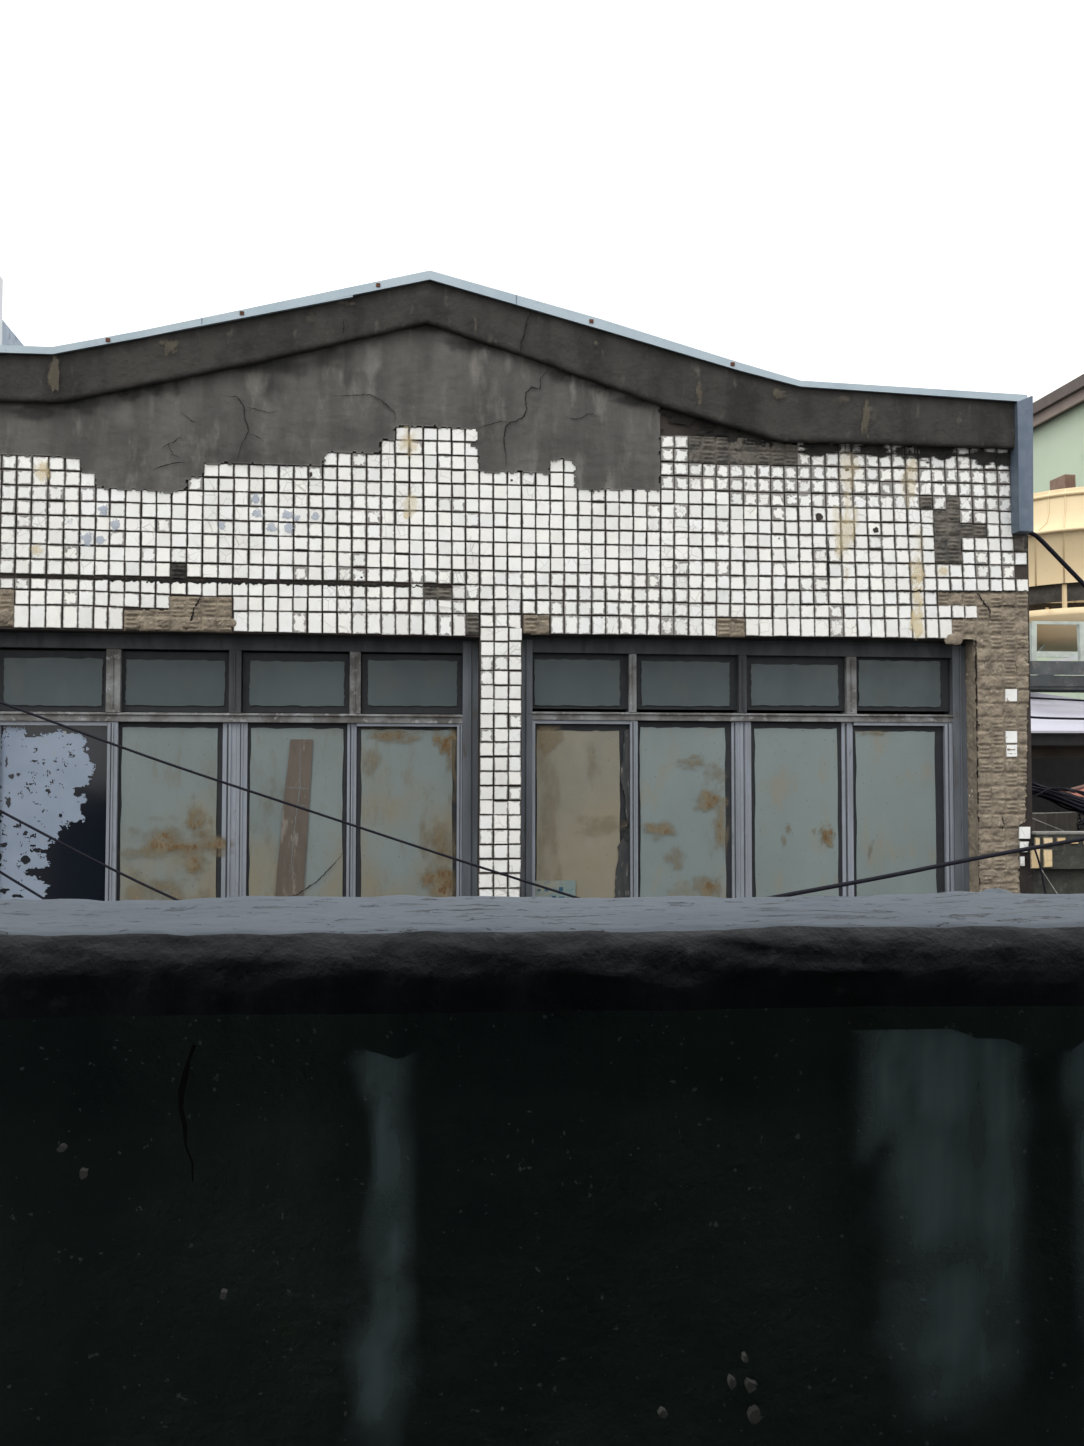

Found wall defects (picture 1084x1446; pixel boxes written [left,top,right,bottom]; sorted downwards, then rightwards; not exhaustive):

crack [153,413,198,470]
crack [223,395,272,461]
crack [478,312,549,454]
peeling [919,496,987,564]
water stain [877,1029,1019,1252]
water stain [921,1262,989,1396]